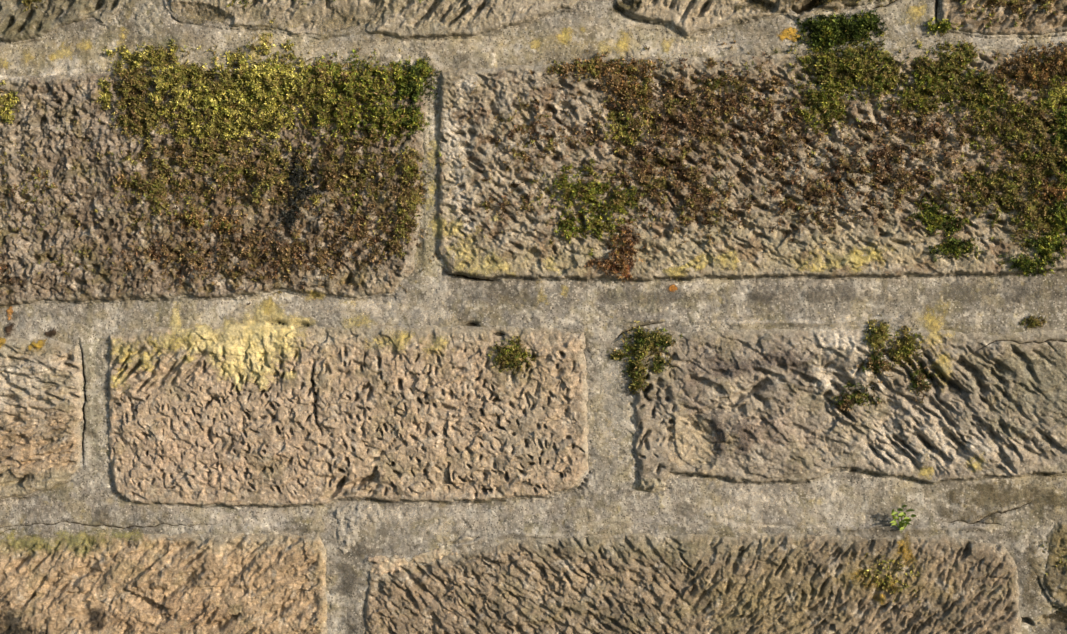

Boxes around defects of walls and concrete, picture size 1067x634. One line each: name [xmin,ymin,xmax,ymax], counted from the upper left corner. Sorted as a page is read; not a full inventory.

crack [968,339,1067,357]
crack [942,502,1031,525]
crack [0,520,213,534]